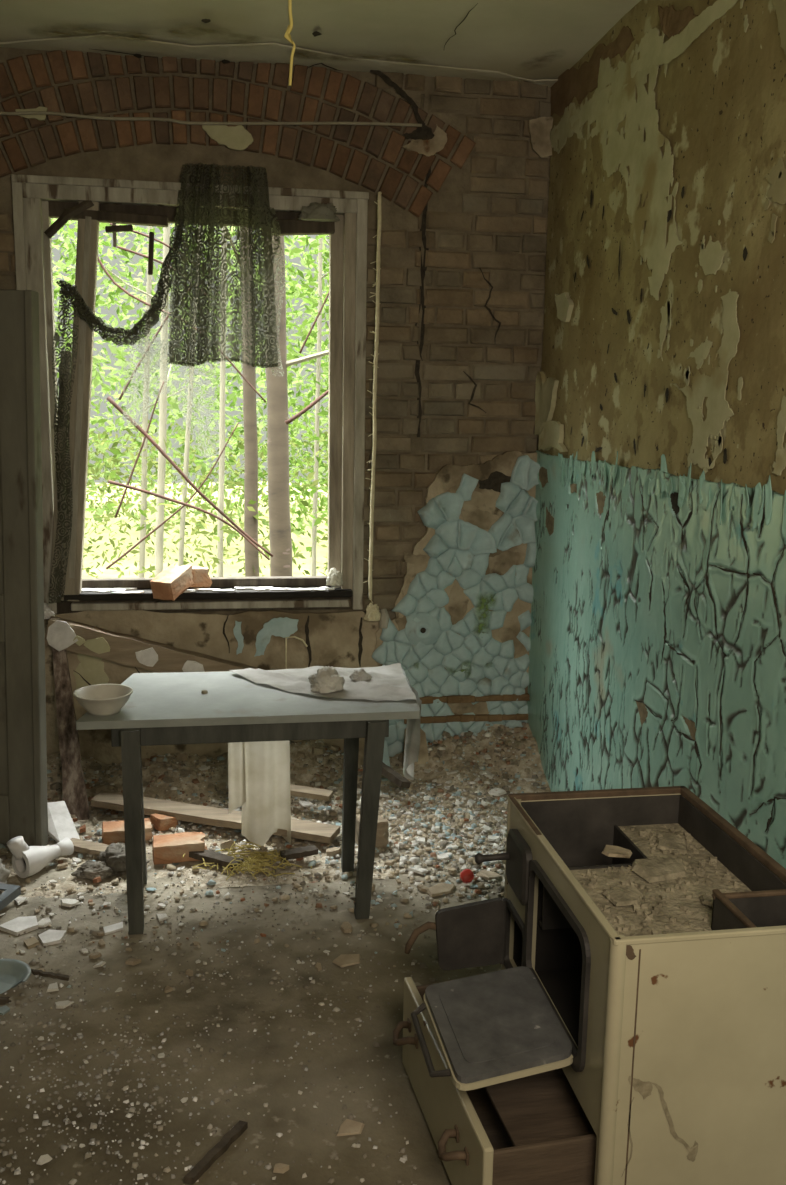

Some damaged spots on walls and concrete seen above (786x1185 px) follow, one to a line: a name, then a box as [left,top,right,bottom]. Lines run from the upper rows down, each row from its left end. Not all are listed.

peeling [372,220,786,870]
peeling [135,647,158,667]
peeling [182,660,204,672]
peeling [233,617,298,657]
crack [602,478,786,832]